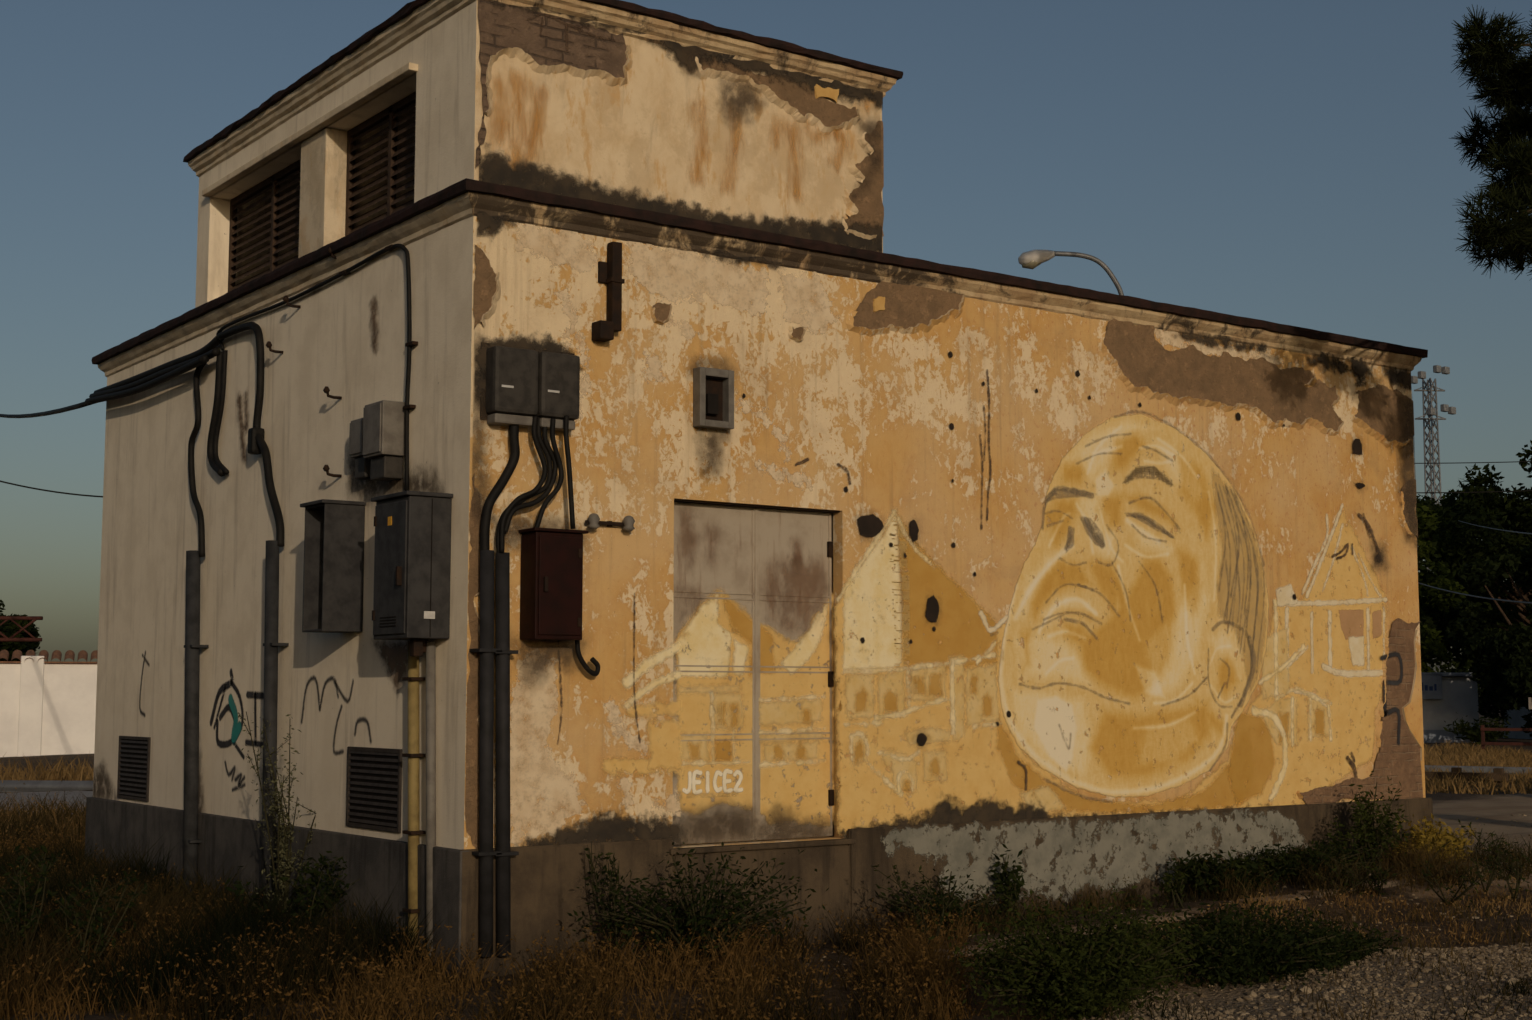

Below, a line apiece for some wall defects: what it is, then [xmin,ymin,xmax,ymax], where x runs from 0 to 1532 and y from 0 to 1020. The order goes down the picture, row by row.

spalling [476,0,633,167]
water stain [489,0,883,166]
spalling [473,245,501,329]
peeling [514,222,598,273]
water stain [477,143,882,253]
water stain [705,249,782,268]
peeling [627,241,965,342]
water stain [1180,329,1268,353]
spalling [1097,318,1414,455]
spalling [858,514,919,558]
spalling [1296,618,1423,804]
peeling [882,808,1308,906]